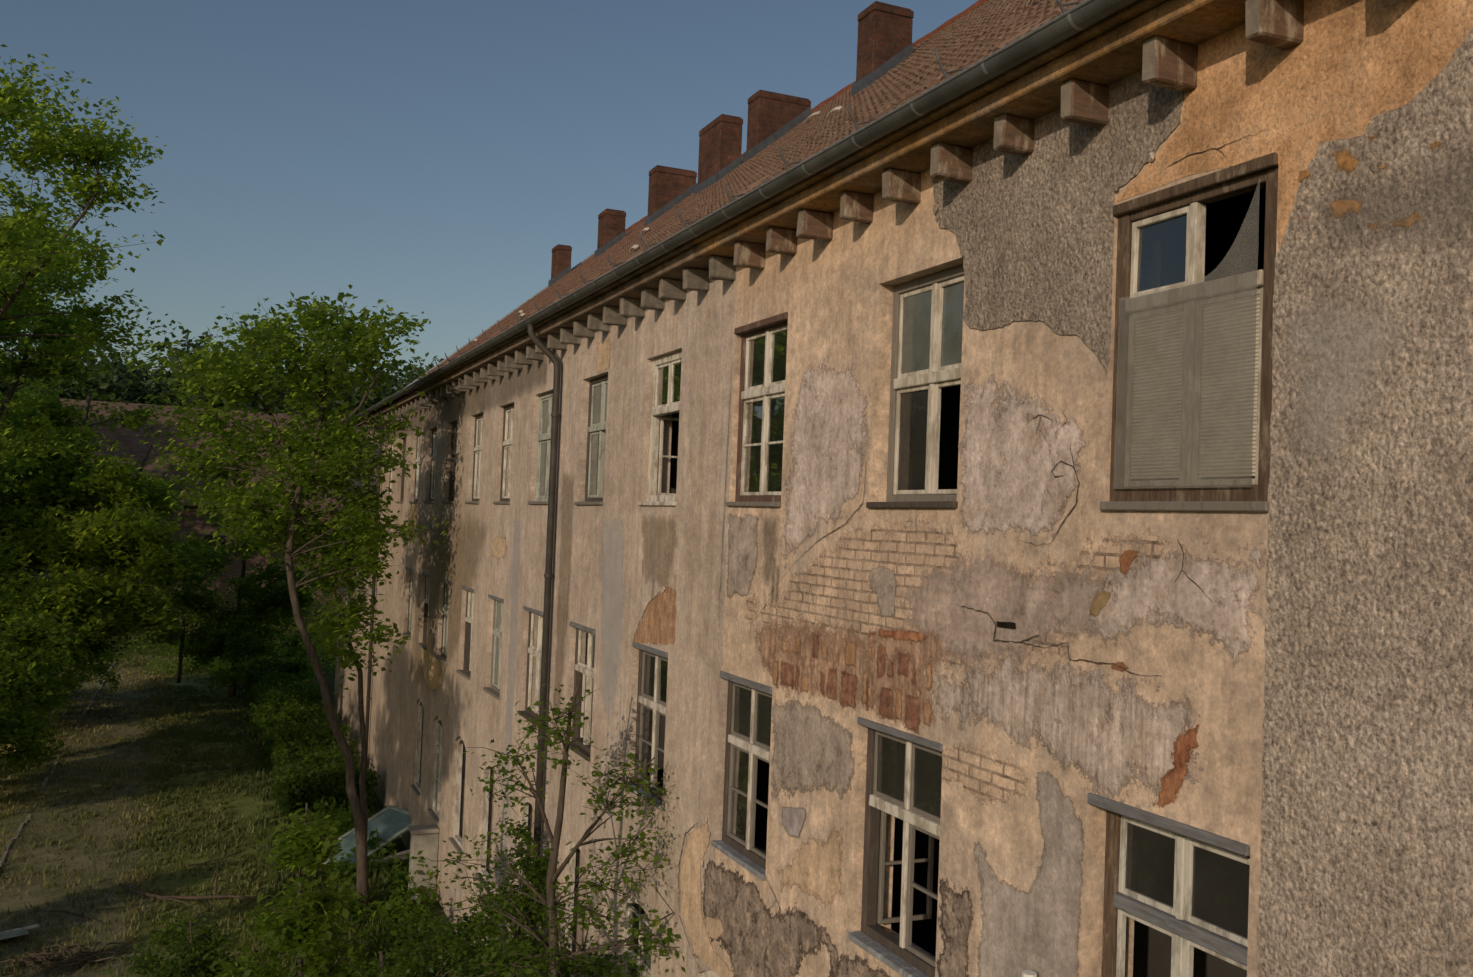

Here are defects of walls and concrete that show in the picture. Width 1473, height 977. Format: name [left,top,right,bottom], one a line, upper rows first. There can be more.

crack [1167,130,1262,167]
spalling [1115,0,1473,248]
flaking render [633,586,677,646]
peeling [744,356,1266,809]
crack [961,606,1160,676]
spalling [677,817,890,977]
spalling [935,878,973,977]